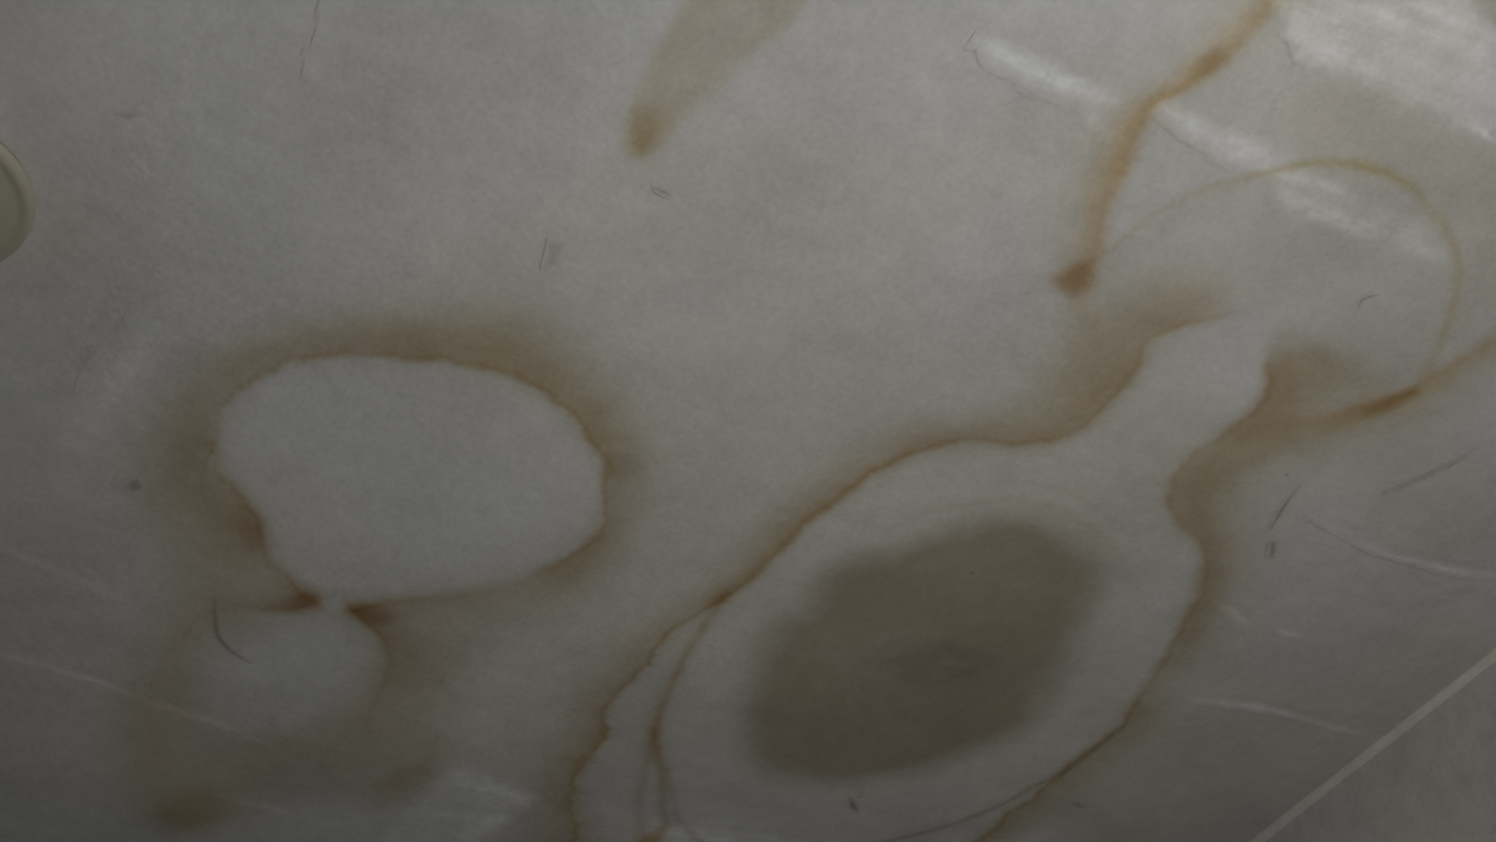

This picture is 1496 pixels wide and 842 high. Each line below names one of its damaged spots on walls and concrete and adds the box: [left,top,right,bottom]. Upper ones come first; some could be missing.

damp [610,0,822,179]
damp [35,267,676,842]
damp [491,29,1496,842]